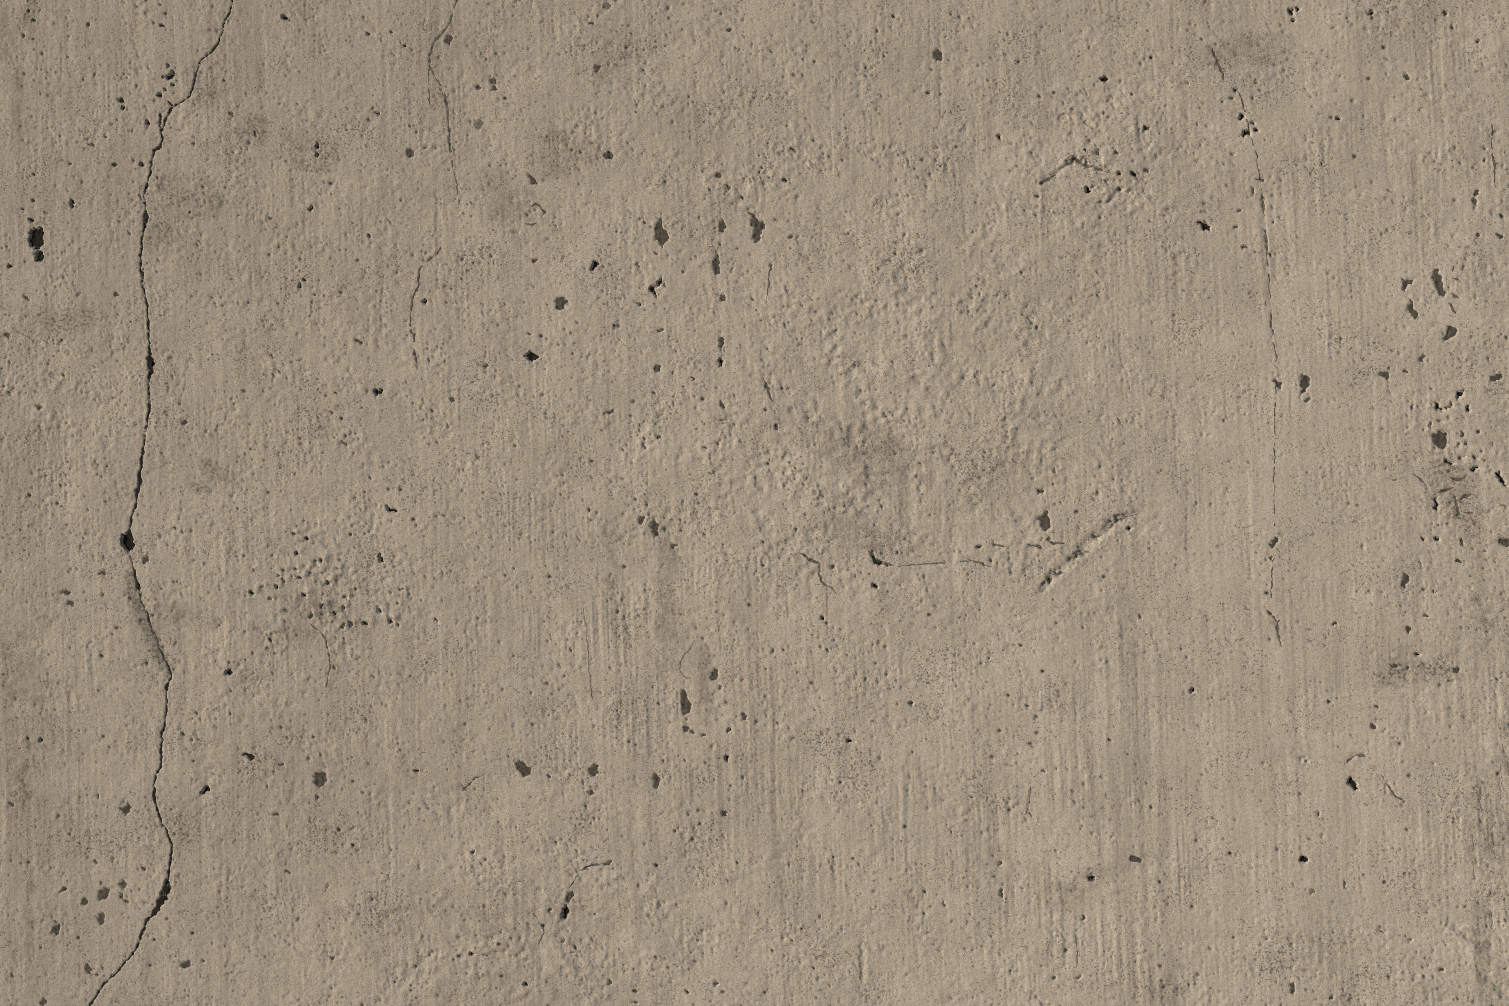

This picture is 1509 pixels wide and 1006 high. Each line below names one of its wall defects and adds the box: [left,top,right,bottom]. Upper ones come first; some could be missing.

crack [89,0,233,1006]